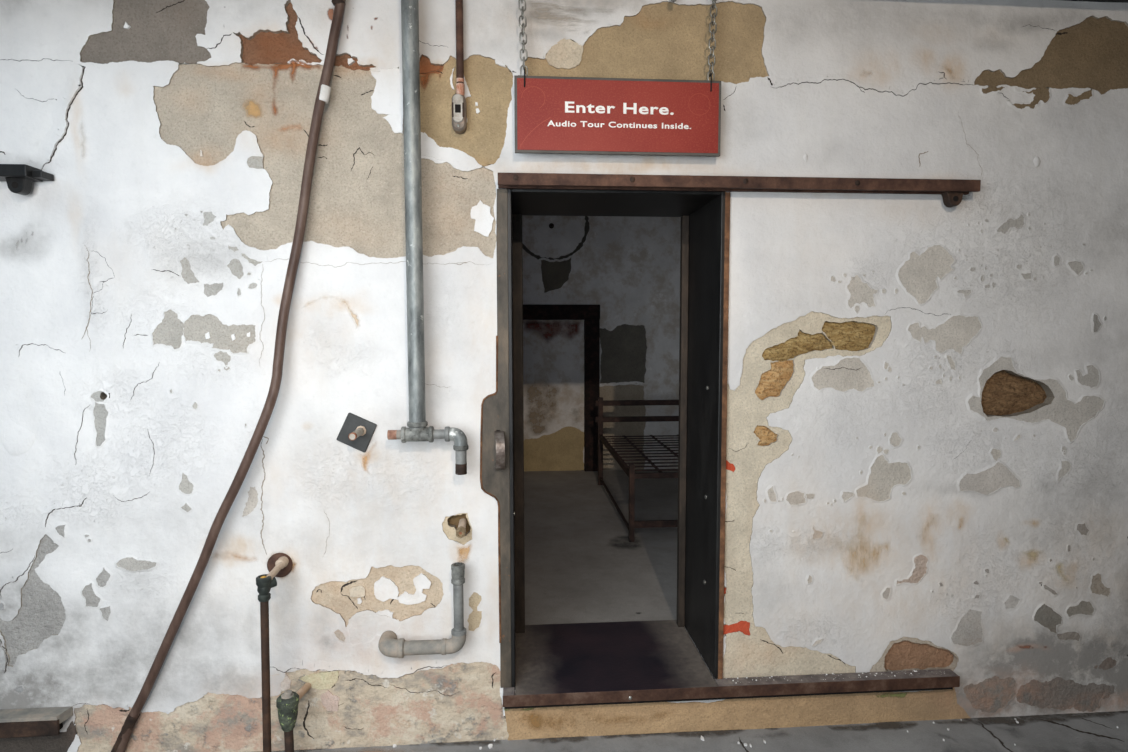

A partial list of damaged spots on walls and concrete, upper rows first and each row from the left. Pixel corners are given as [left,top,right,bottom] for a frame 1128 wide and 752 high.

crack [0,58,85,170]
peeling [75,0,406,373]
corrosion [244,61,319,78]
peeling [419,0,773,262]
crack [770,71,975,97]
peeling [969,11,1128,112]
peeling [723,243,996,678]
peeling [956,354,1106,497]
peeling [0,522,159,671]
peeling [306,561,448,645]
peeling [0,655,1118,752]
crack [978,721,1013,752]